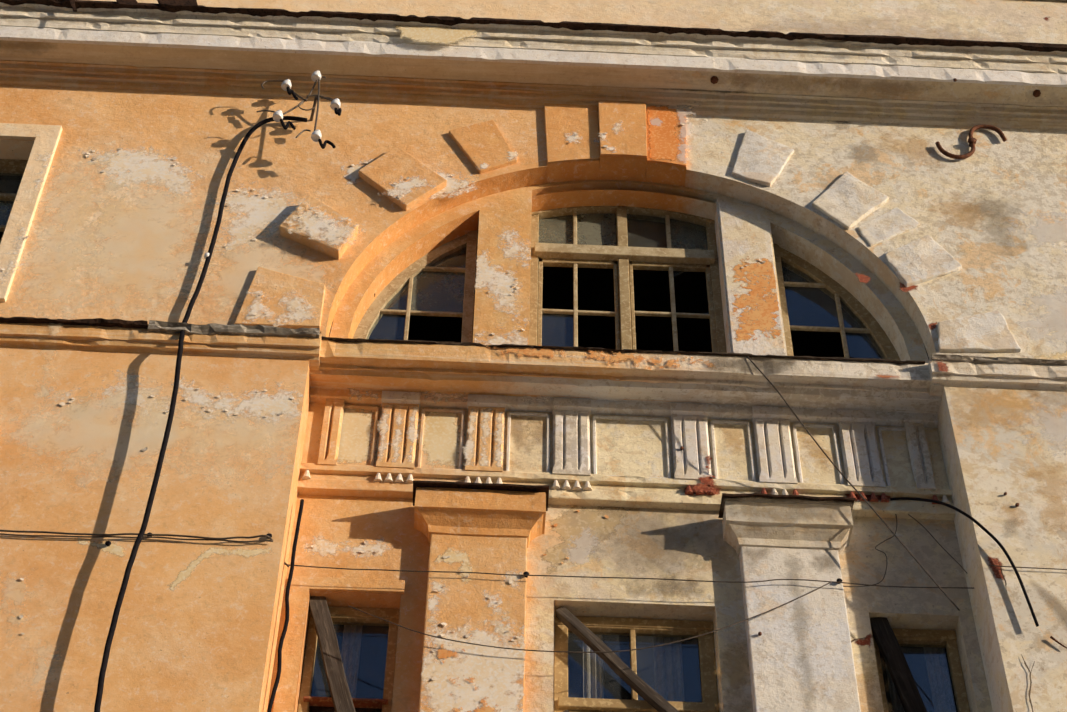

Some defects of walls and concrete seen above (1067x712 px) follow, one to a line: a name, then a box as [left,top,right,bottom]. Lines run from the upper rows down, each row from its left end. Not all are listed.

peeling [85,147,203,196]
peeling [475,230,531,345]
peeling [731,256,783,343]
peeling [13,370,303,482]
flaking render [684,456,721,495]
peeling [304,536,388,557]
peeling [436,549,472,582]
flaking render [988,557,1005,580]
peeling [421,582,526,712]